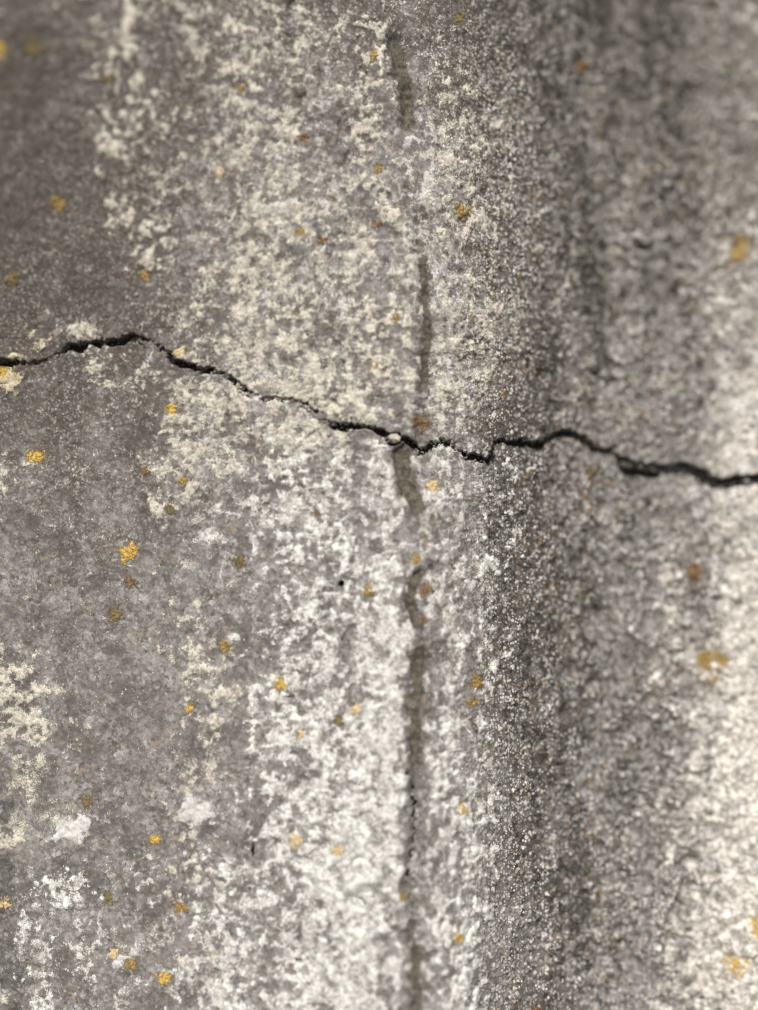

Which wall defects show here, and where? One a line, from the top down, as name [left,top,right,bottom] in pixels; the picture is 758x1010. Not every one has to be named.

crack [0,335,758,490]
crack [404,771,417,876]